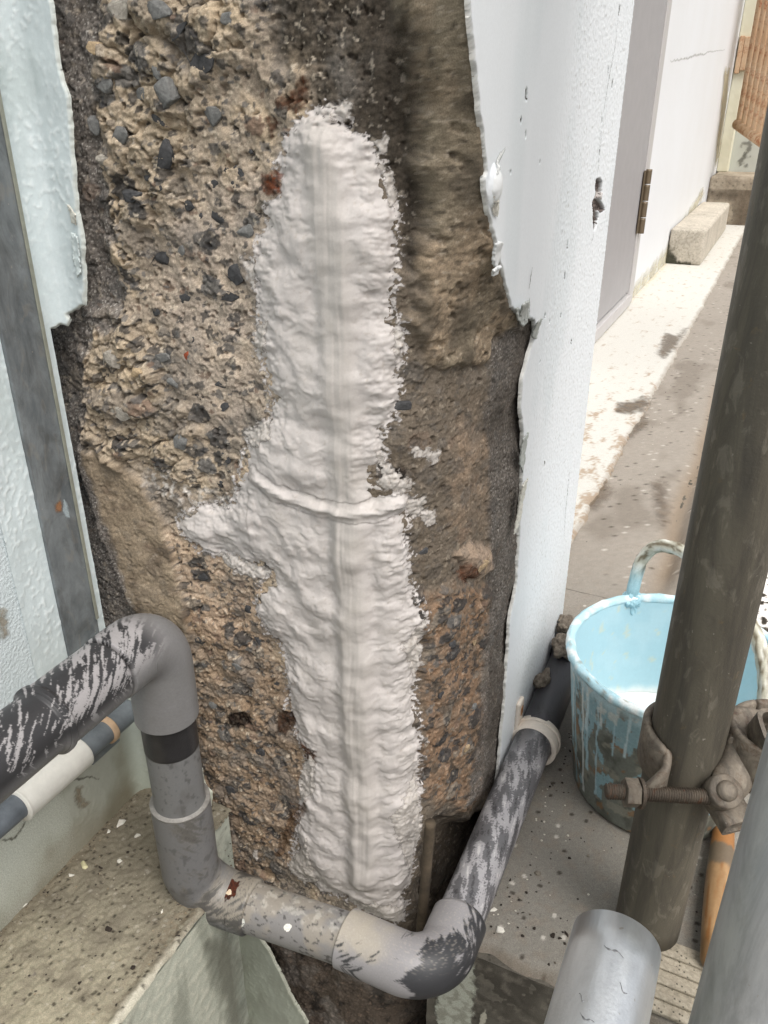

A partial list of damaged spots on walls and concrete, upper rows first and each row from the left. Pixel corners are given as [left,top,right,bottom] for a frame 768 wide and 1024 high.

rust [261,170,283,195]
peeling [592,180,605,229]
spalling [51,0,543,932]
spalling [266,941,427,1024]